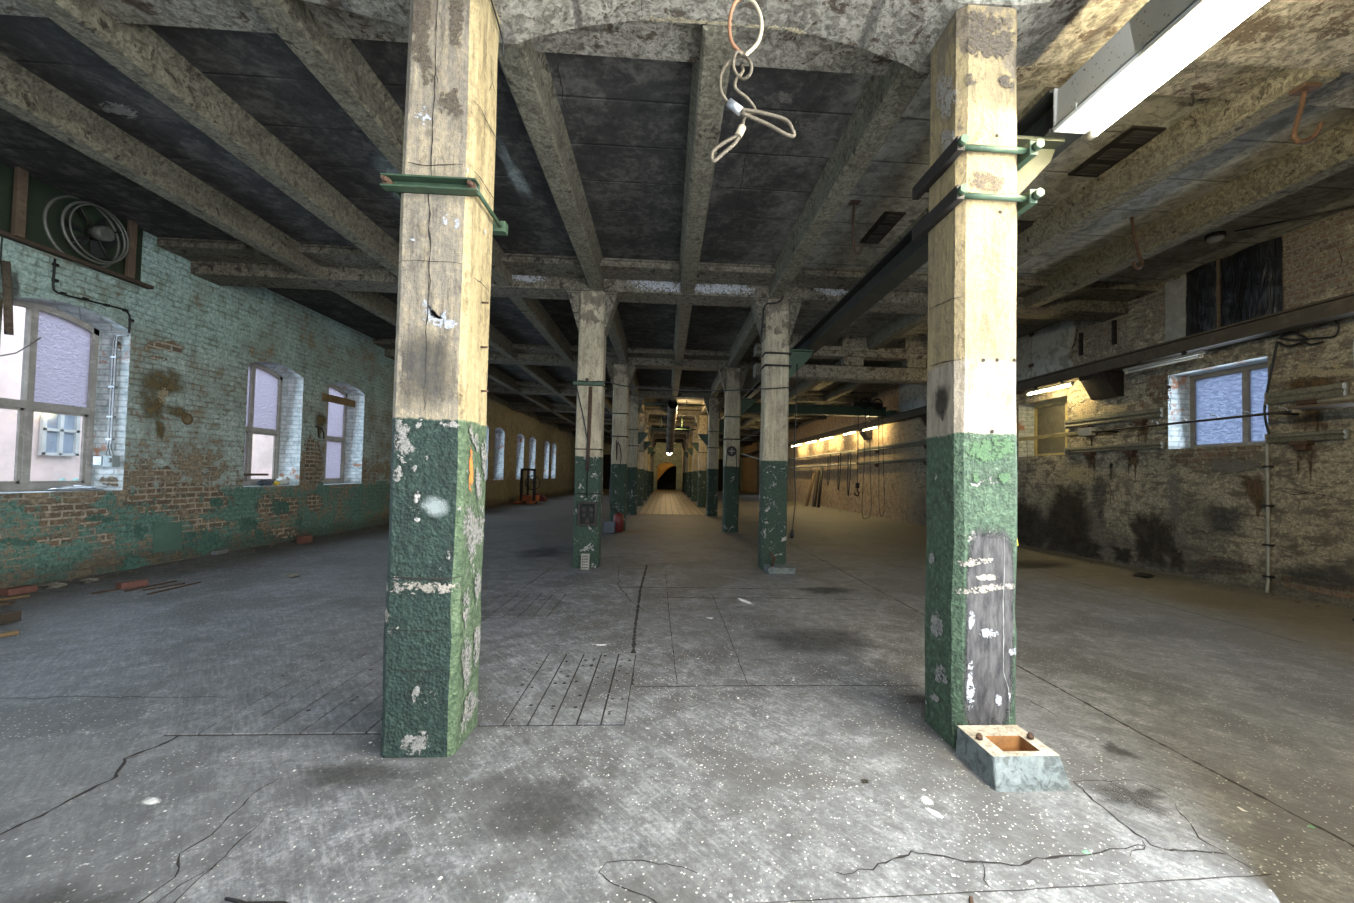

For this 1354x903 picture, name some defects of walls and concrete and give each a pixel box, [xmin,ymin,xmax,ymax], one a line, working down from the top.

corrosion [1244,477,1264,517]
peeling [385,419,487,728]
spalling [953,558,1015,594]
peeling [930,611,943,640]
peeling [968,611,999,638]
peeling [930,664,948,702]
peeling [966,661,975,709]
peeling [400,731,429,756]
crack [0,735,180,835]
crack [836,780,1251,885]
crack [597,860,697,903]